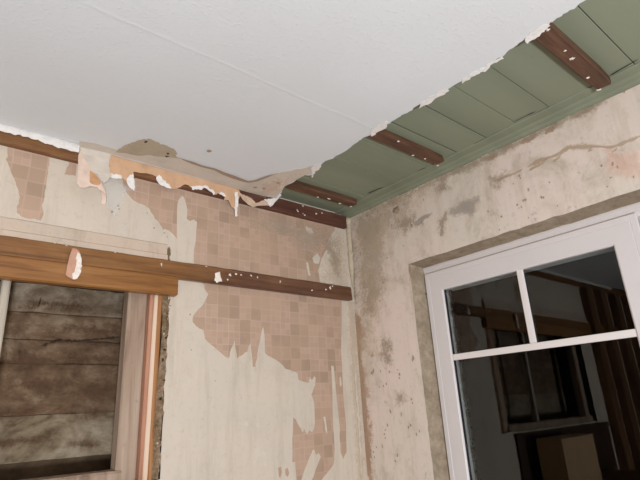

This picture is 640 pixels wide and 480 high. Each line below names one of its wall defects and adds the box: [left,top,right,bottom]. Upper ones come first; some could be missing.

peeling [77,147,281,217]
damp [355,100,604,315]
crack [500,137,638,181]
flaking render [152,296,171,480]